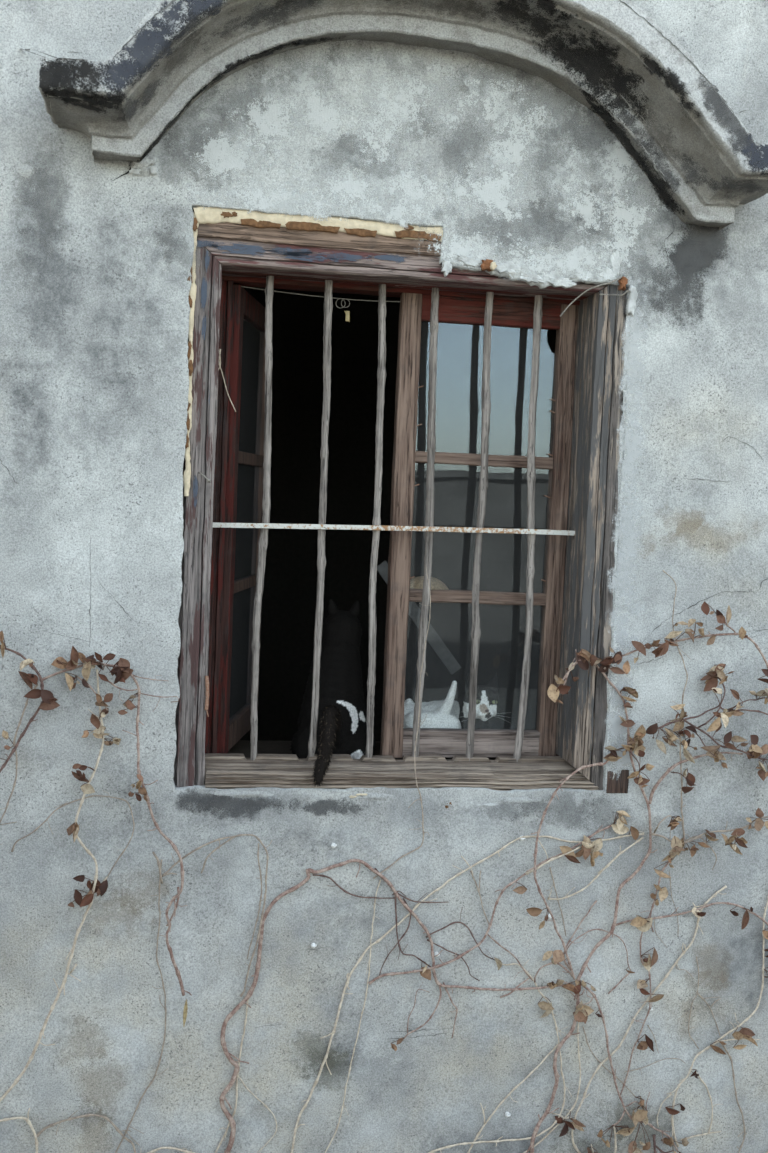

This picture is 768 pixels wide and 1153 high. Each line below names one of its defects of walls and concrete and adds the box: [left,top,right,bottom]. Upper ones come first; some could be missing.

damp [38,0,768,326]
peeling [183,56,668,506]